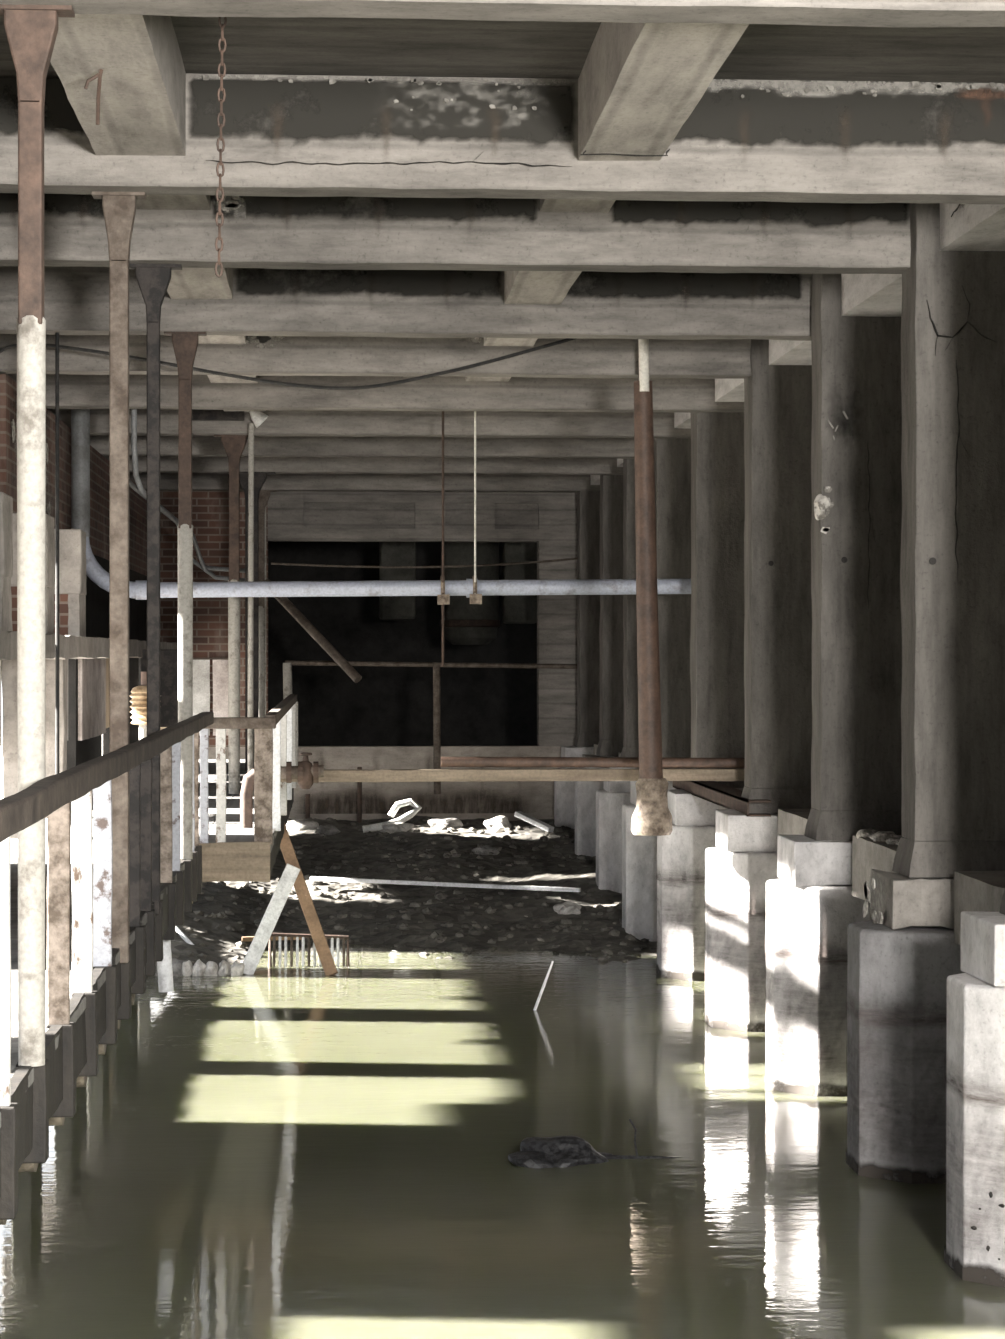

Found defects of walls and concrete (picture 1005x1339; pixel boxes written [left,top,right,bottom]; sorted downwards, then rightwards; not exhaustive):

peeling [203,74,307,83]
peeling [324,76,549,111]
crack [927,286,997,582]